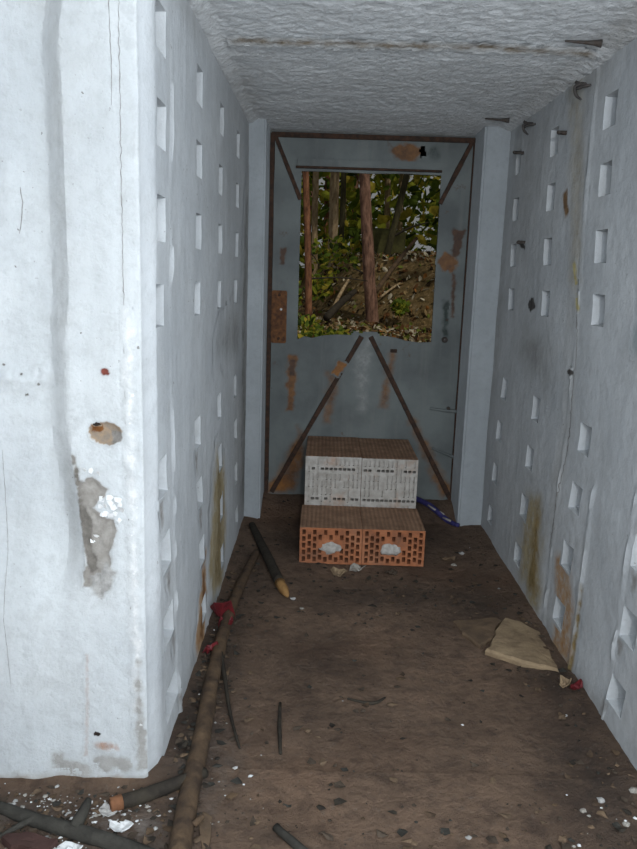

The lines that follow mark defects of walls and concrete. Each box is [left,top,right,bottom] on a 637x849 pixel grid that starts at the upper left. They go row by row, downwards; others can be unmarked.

peeling [47,5,148,778]
corrosion [435,226,468,319]